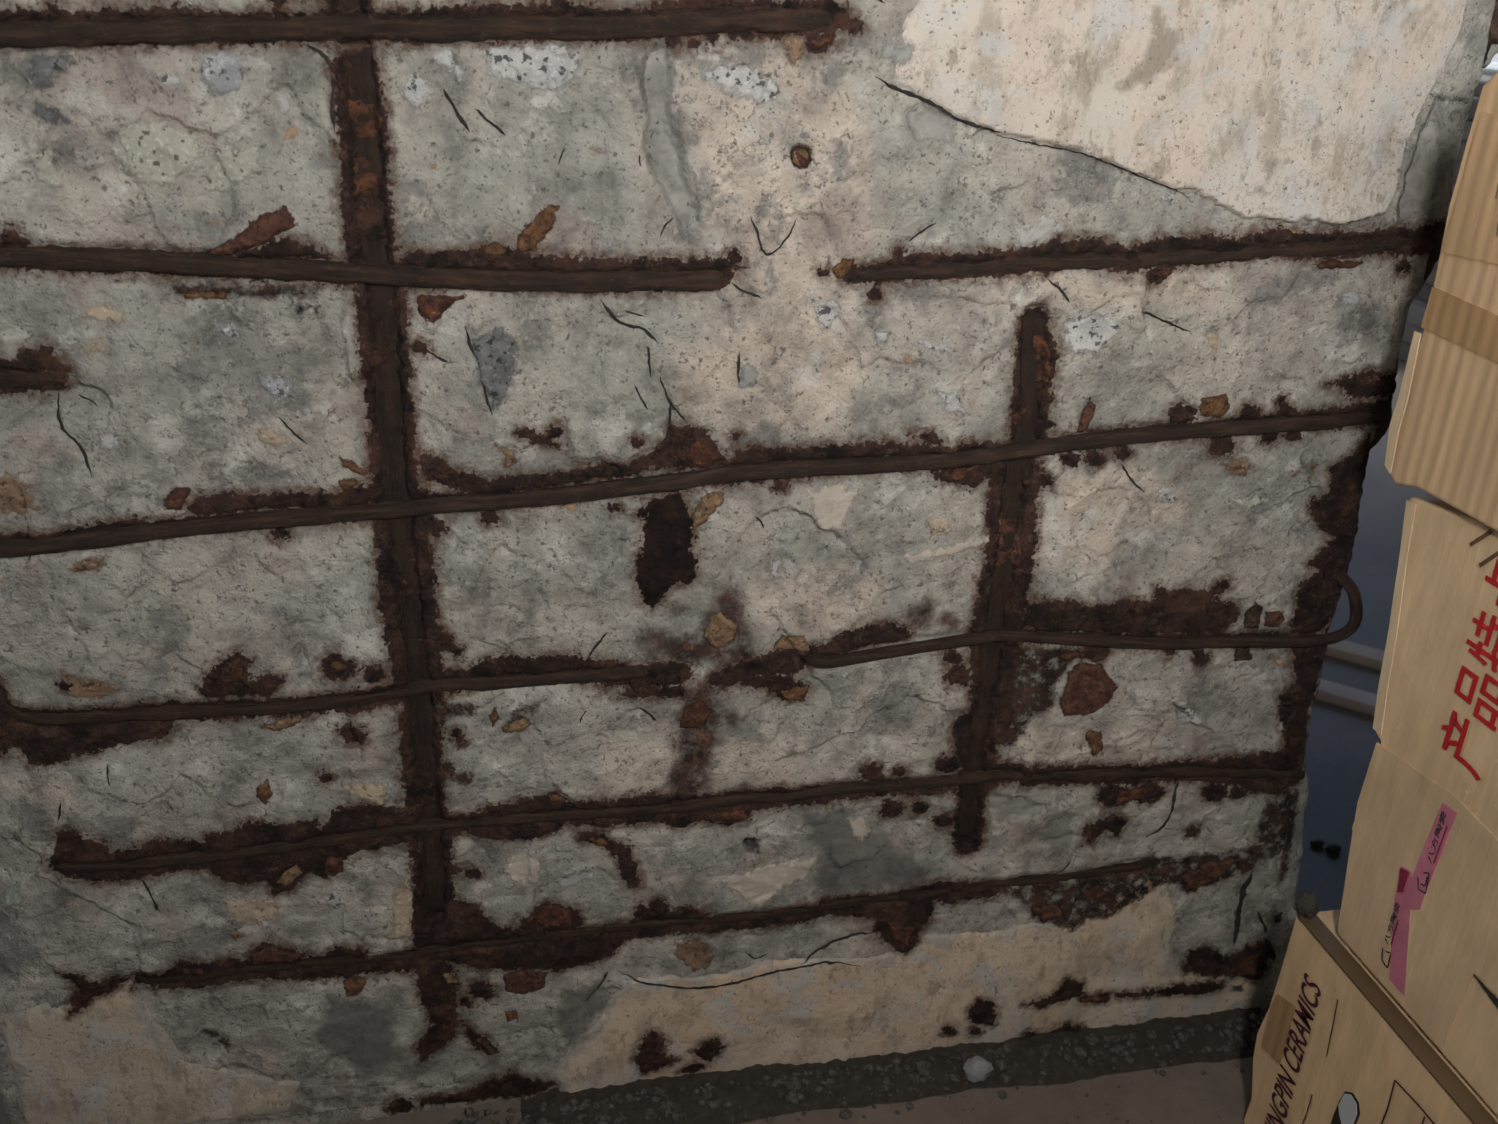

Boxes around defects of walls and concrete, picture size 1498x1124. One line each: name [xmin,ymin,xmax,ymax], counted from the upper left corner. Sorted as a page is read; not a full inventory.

spalling [0,0,328,16]
spalling [0,41,352,262]
corrosion [0,0,867,290]
spalling [372,0,1496,495]
crack [875,76,1190,199]
corrosion [817,218,1447,305]
crack [57,393,98,477]
spalling [0,266,373,536]
spalling [0,423,1377,1124]
corrosion [0,266,1397,1116]
crack [587,932,874,1000]